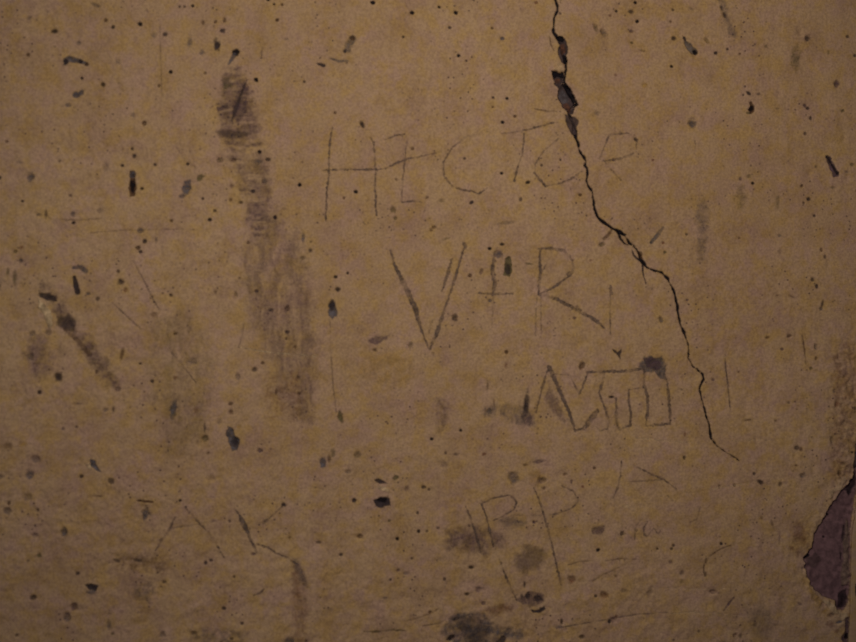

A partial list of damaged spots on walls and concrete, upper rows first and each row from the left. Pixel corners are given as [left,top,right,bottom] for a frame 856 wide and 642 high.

crack [551,0,739,461]
flaking render [803,467,856,642]